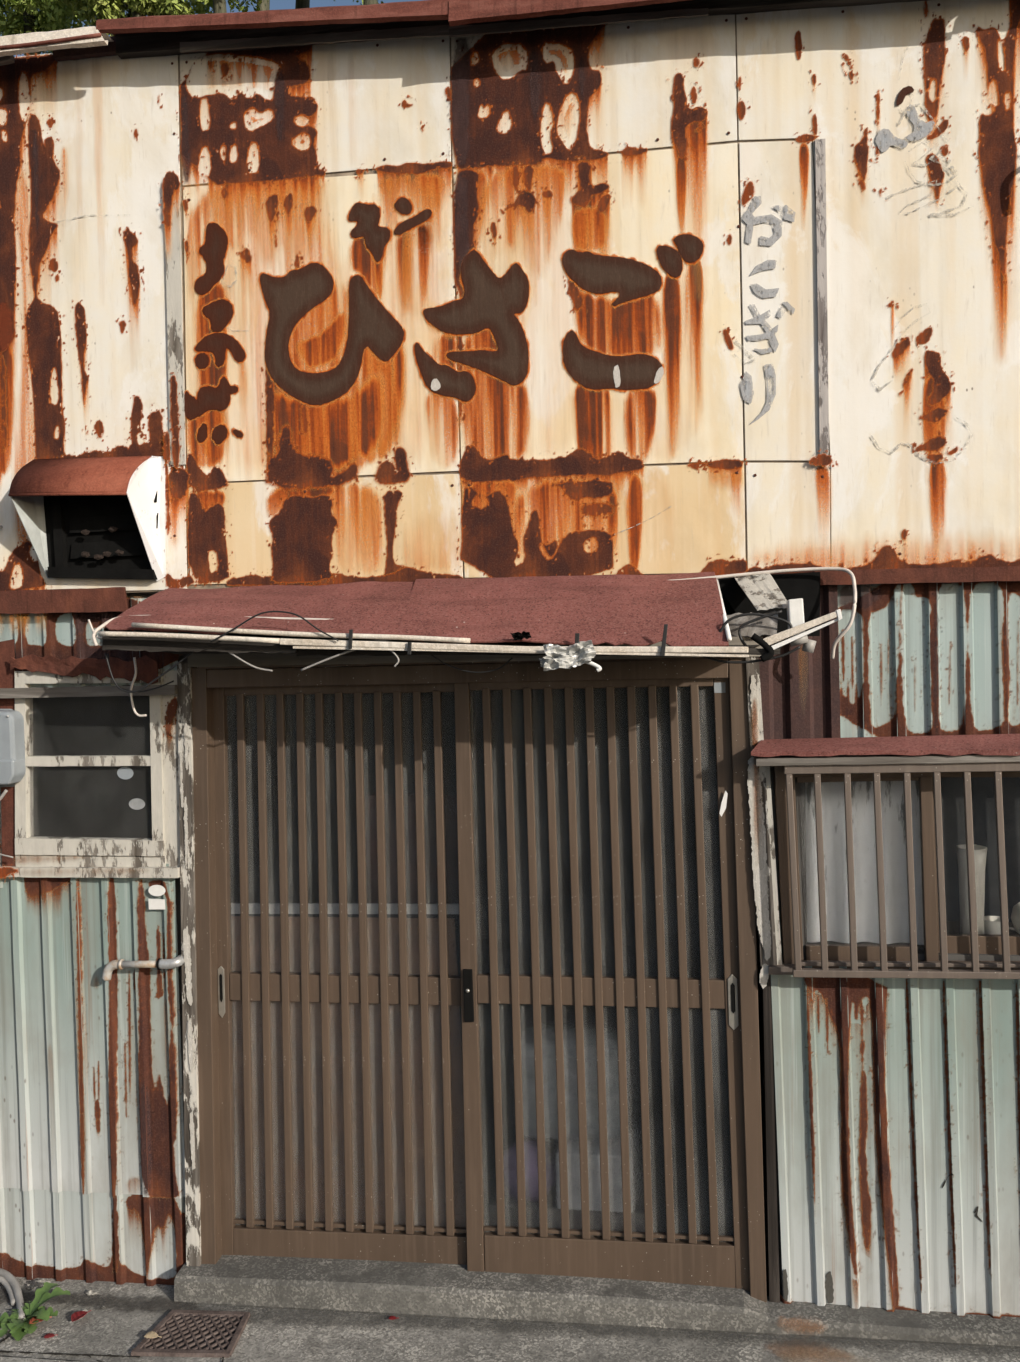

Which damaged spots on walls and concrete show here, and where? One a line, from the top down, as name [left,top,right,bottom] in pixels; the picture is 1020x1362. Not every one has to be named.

corrosion [0,24,709,591]
corrosion [736,77,751,120]
corrosion [738,178,758,207]
corrosion [918,0,1020,342]
corrosion [688,456,748,494]
corrosion [701,301,1020,737]
peeling [180,721,189,869]
peeling [750,675,758,720]
peeling [747,757,771,989]
corrosion [0,864,186,1286]
peeling [183,929,194,1072]
corrosion [803,977,922,1312]